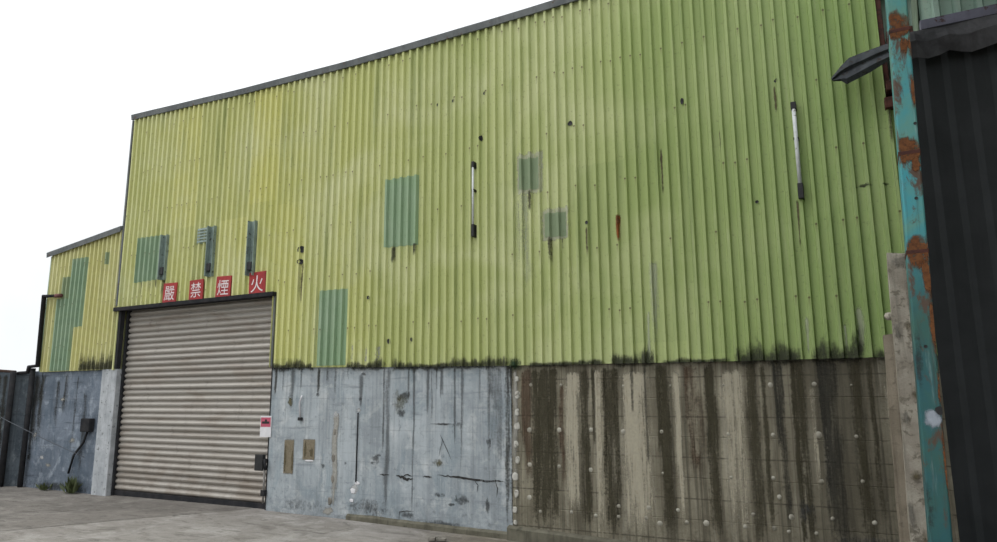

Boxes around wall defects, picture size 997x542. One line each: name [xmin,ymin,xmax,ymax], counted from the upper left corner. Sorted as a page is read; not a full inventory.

corrosion [888,11,912,57]
corrosion [888,109,921,171]
corrosion [906,235,937,353]
leakage [272,361,328,406]
leakage [346,346,513,513]
leakage [530,313,889,542]